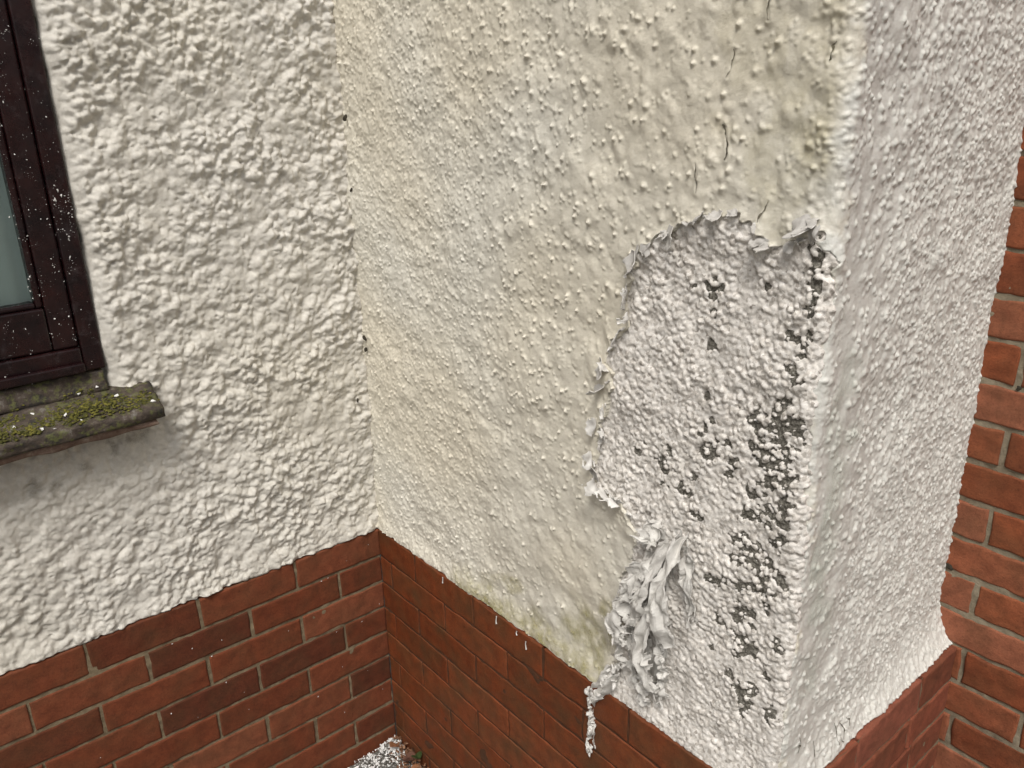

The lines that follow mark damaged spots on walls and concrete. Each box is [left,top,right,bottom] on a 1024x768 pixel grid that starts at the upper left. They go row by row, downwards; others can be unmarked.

peeling [581,208,839,768]